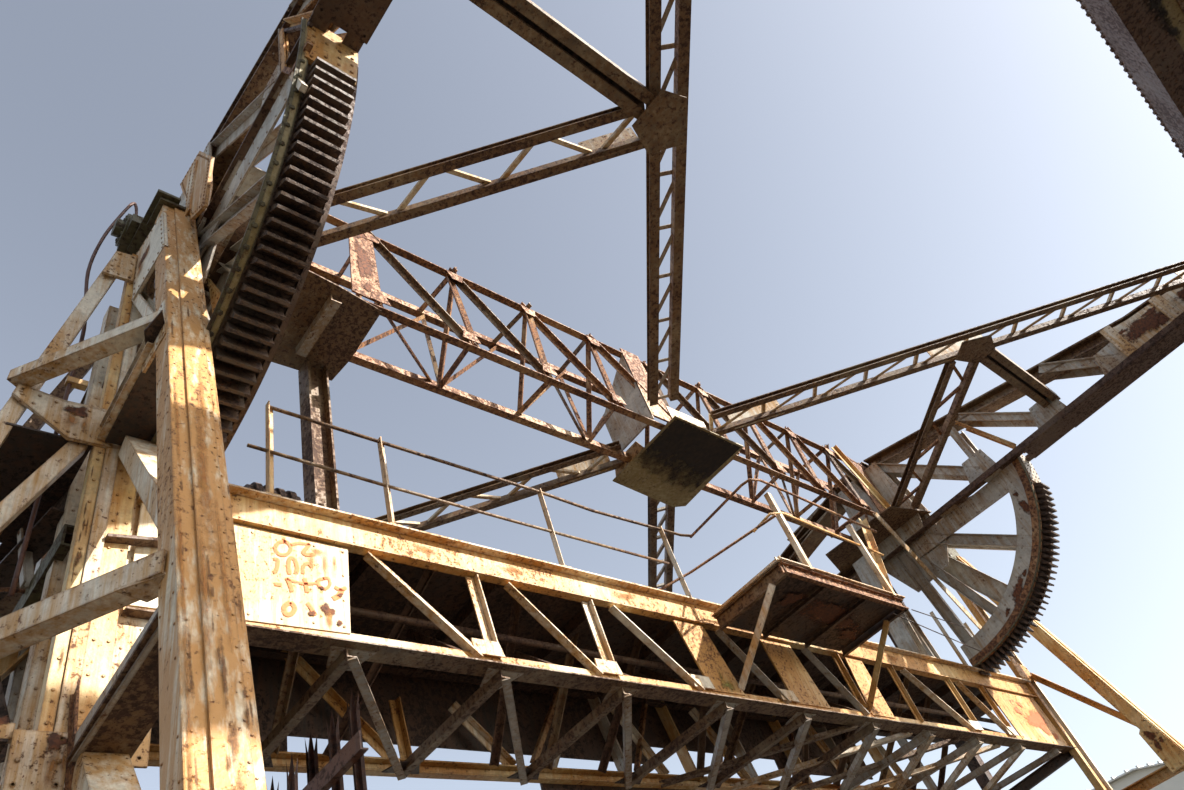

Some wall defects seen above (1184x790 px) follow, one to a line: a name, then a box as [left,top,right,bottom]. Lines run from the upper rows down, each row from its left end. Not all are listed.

rust [354,234,372,292]
rust [1119,306,1170,351]
rust [1013,491,1030,513]
rust [309,586,343,626]
rust [1006,569,1026,617]